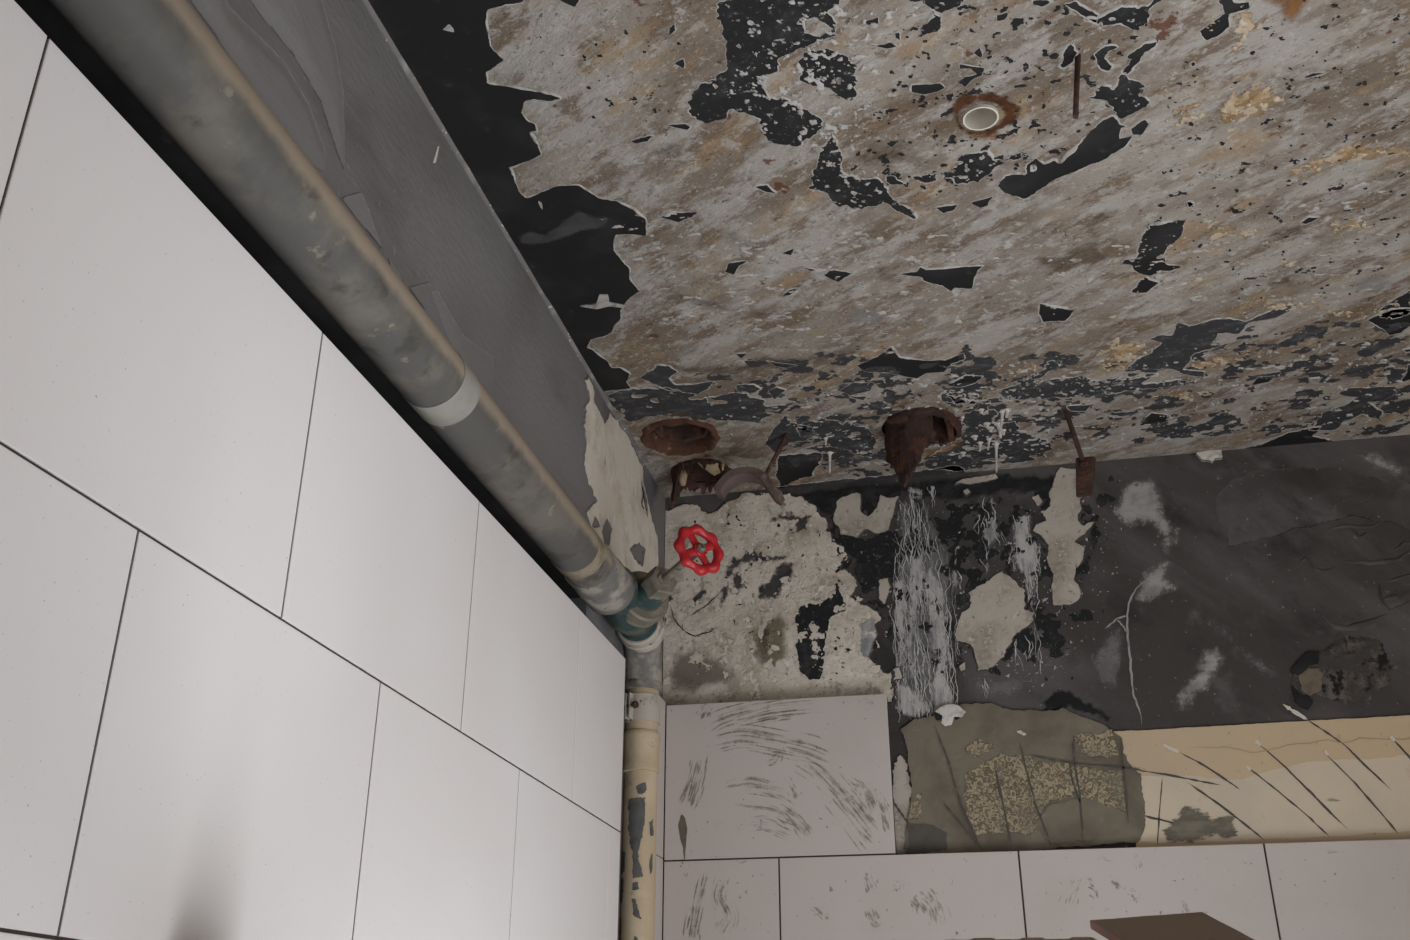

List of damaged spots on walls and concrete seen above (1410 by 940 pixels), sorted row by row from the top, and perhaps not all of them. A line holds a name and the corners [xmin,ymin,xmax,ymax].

corrosion [1274,0,1304,17]
corrosion [952,92,1020,138]
peeling [1299,215,1321,225]
peeling [368,0,1293,717]
peeling [1248,289,1410,448]
damp [1114,482,1172,545]
damp [689,550,793,608]
damp [756,486,962,722]
damp [974,497,1063,698]
damp [674,654,728,691]
flaking render [934,704,966,727]
crack [1203,737,1410,753]